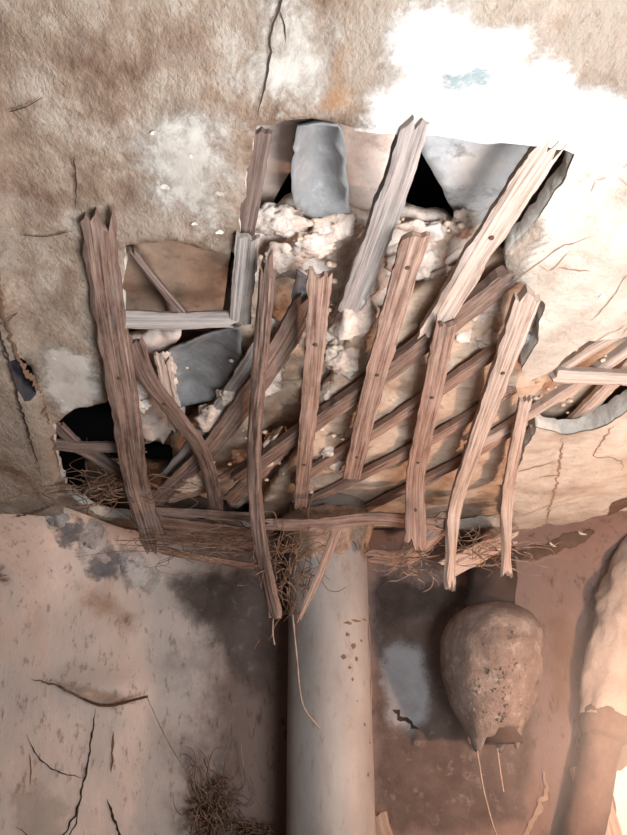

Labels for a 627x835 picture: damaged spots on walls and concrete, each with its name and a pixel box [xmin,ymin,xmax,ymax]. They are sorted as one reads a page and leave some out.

crack [256,0,286,120]
crack [71,157,79,208]
peeling [134,113,233,234]
peeling [367,5,627,382]
crack [586,165,627,191]
crack [0,277,61,476]
peeling [44,348,100,414]
crack [564,276,627,367]
crack [16,504,55,517]
flaking render [46,513,160,594]
peeling [512,412,627,560]
crack [27,716,95,835]